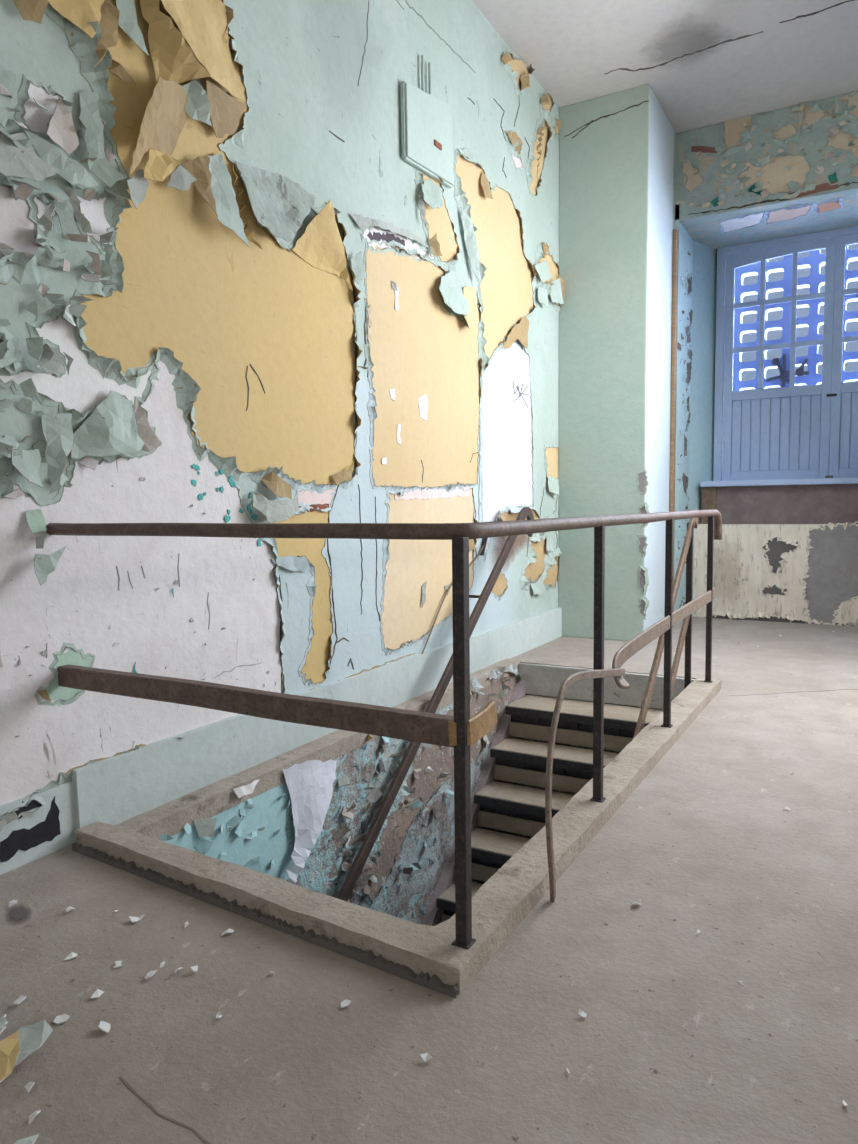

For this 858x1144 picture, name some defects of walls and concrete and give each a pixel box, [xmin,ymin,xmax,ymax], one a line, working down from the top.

peeling [160,734,454,907]
spalling [71,842,460,999]